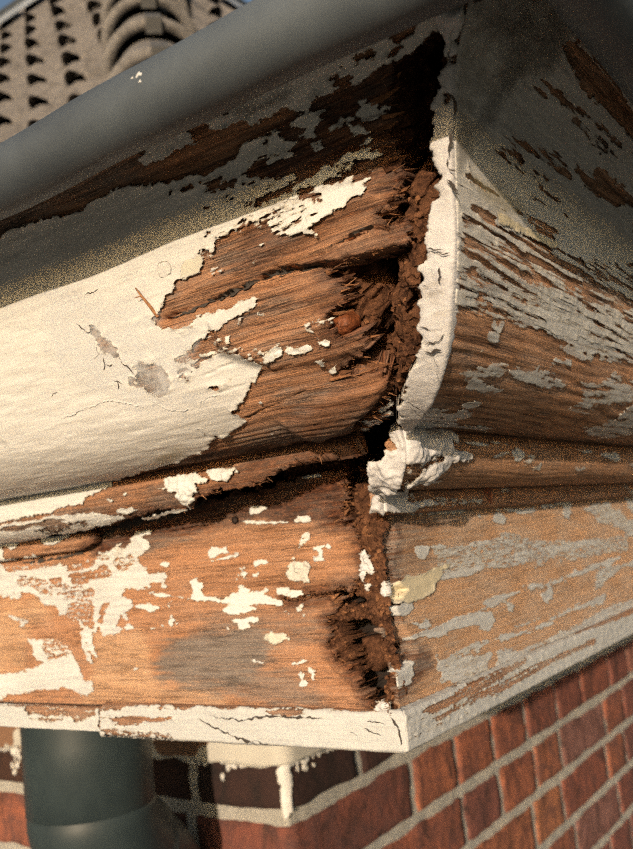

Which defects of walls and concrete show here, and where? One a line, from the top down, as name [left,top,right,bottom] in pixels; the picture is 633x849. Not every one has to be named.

crack [443,86,459,195]
peeling [415,0,633,438]
crack [424,248,448,290]
peeling [0,19,438,664]
crack [418,326,444,377]
peeling [465,441,542,471]
peeling [575,441,620,462]
peeling [0,484,633,754]
crack [200,715,320,745]
crack [351,718,402,745]